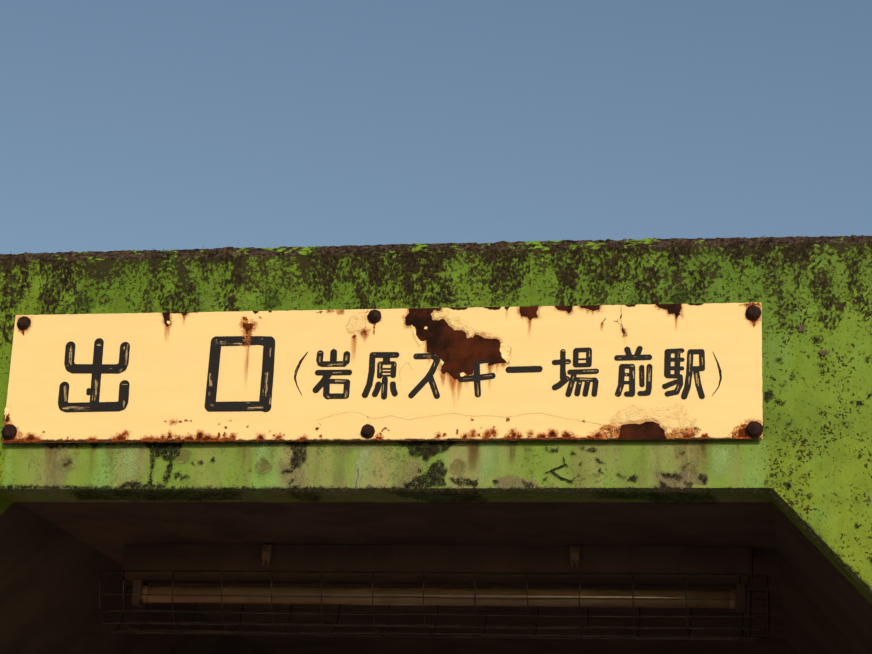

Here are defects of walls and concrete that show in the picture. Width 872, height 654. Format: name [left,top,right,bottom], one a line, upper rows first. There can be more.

damp [0,251,85,347]
damp [151,245,245,312]
damp [306,246,456,309]
damp [478,242,532,305]
damp [549,239,708,306]
crack [545,456,580,483]
damp [0,441,872,597]